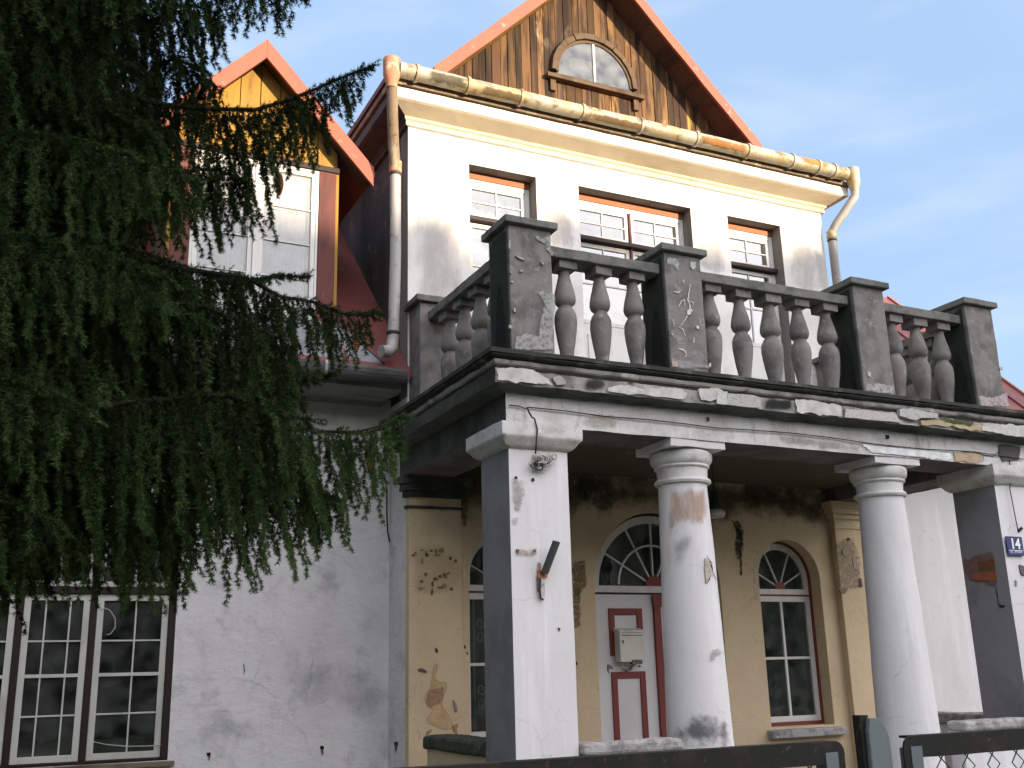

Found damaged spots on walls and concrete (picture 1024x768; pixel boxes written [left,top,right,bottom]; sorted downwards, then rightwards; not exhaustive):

corrosion [702,136,746,152]
peeling [508,291,555,350]
crack [670,280,699,357]
peeling [608,385,762,408]
spalling [866,371,894,394]
spalling [979,392,1009,407]
peeling [795,399,1024,463]
damp [455,467,482,524]
damp [568,473,658,510]
damp [707,485,806,575]
flaking render [964,552,1005,608]
peeling [418,648,458,735]